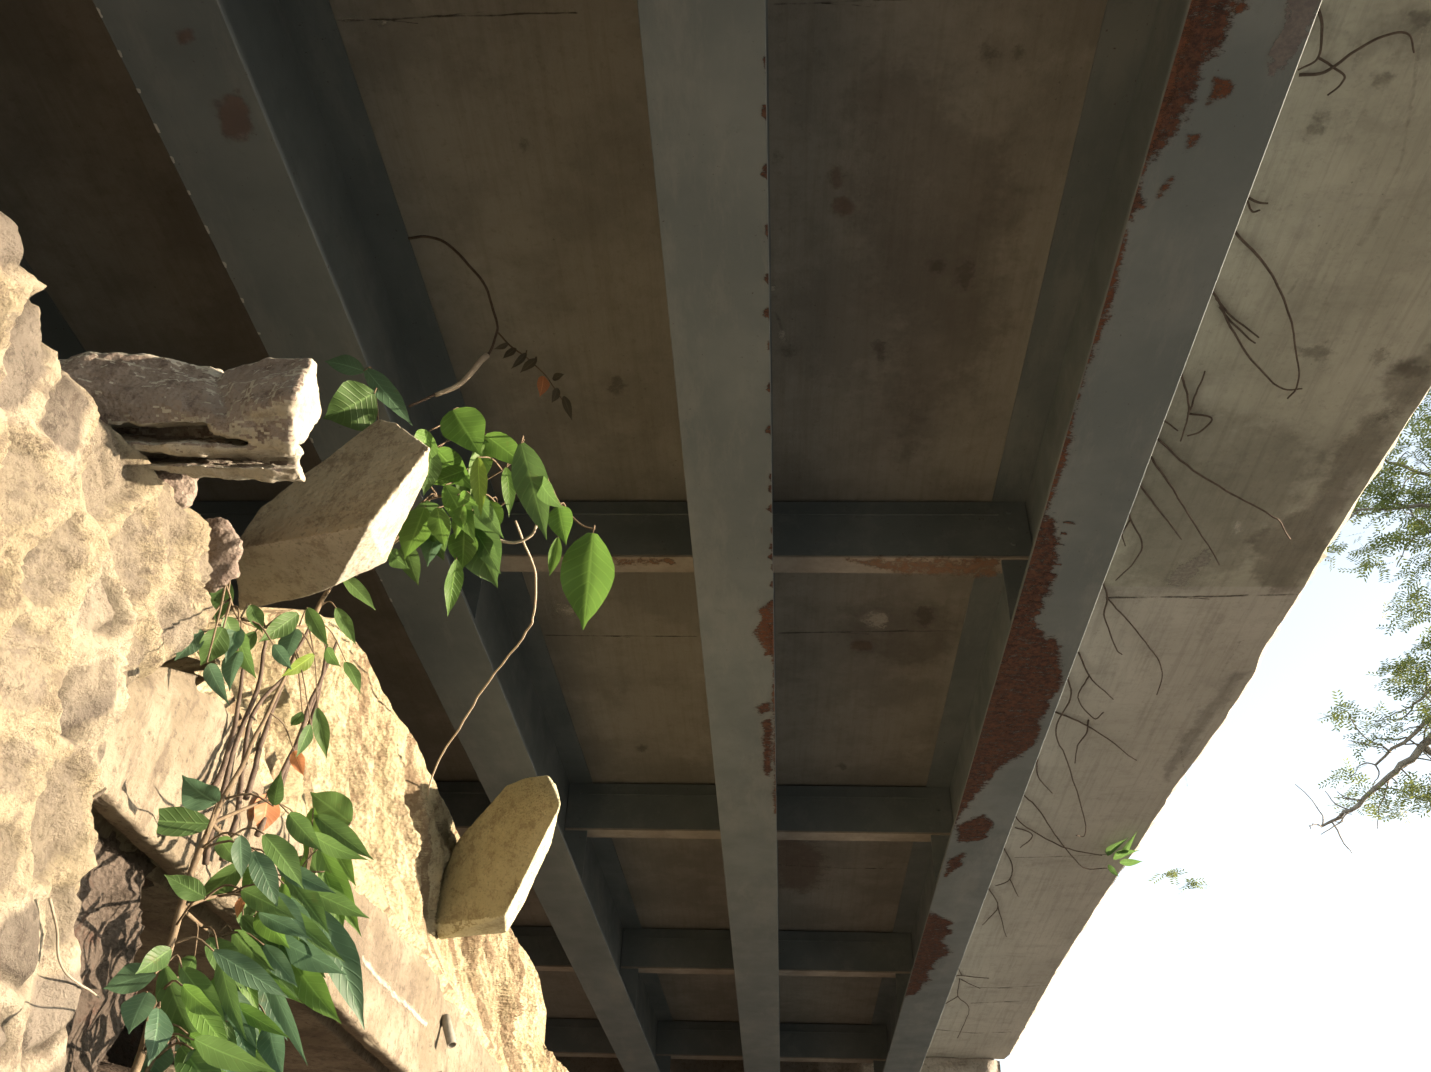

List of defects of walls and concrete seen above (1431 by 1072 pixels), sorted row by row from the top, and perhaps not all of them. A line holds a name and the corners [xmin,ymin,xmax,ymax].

peeling [1267,0,1321,77]
corrosion [944,0,1248,877]
crack [1108,592,1285,600]
corrosion [754,474,776,814]
corrosion [905,913,953,997]